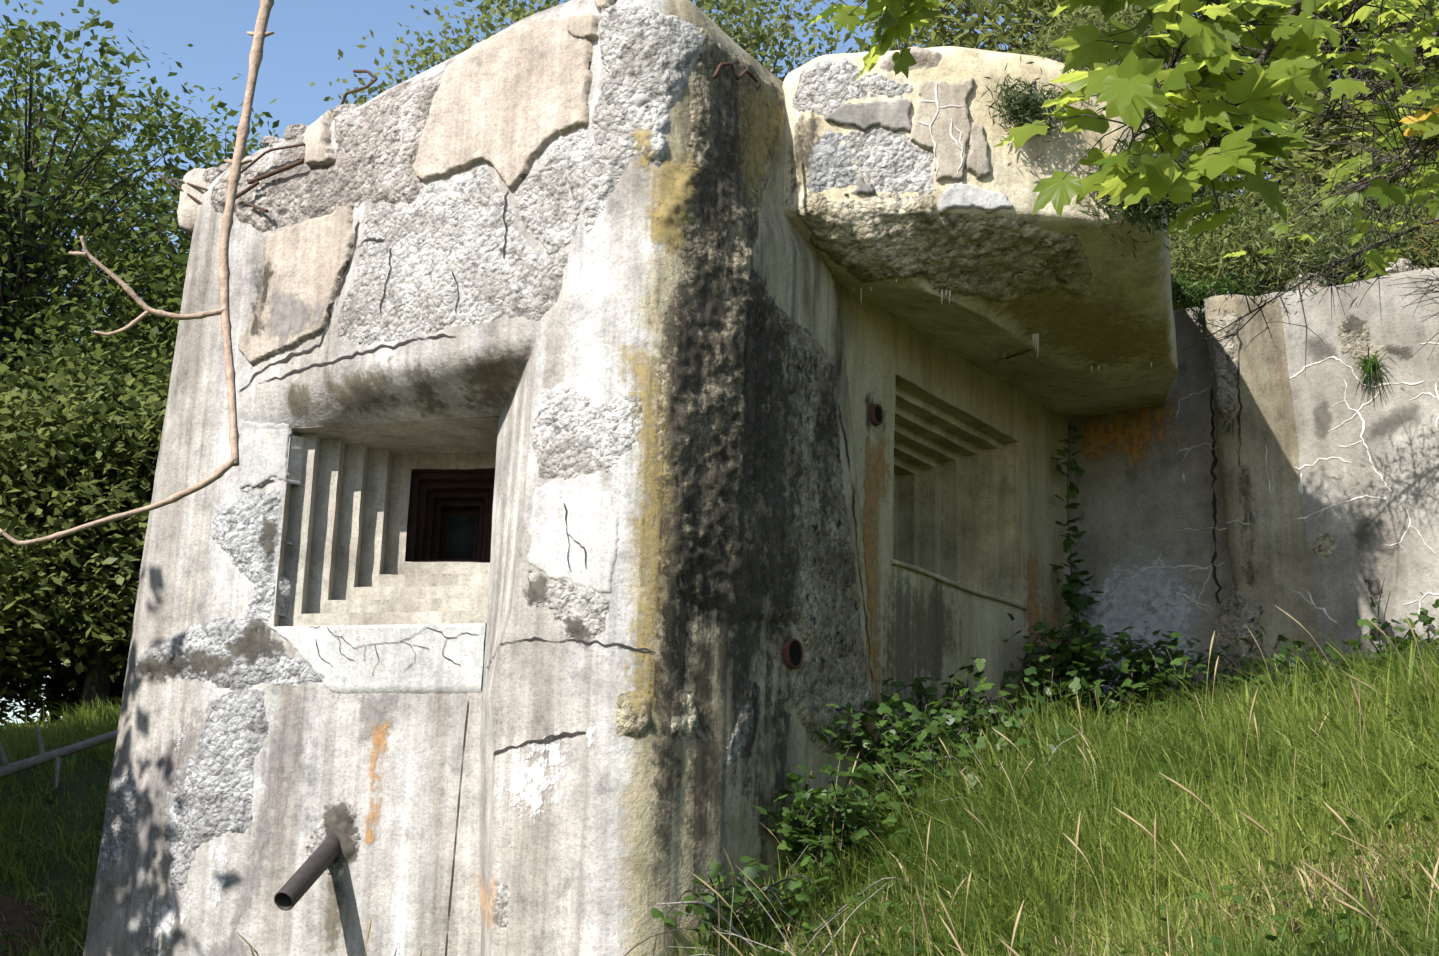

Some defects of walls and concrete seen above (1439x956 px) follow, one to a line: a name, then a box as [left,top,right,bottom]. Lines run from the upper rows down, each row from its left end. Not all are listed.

spalling [211,0,1093,765]
damp [621,43,842,900]
crack [1176,317,1439,553]
spalling [133,421,325,891]
crack [308,626,656,675]
corrosion [847,436,890,756]
crack [1126,520,1250,609]
crack [1291,589,1338,624]
crack [1404,592,1439,623]
corrosion [365,721,390,844]
crack [492,731,586,761]